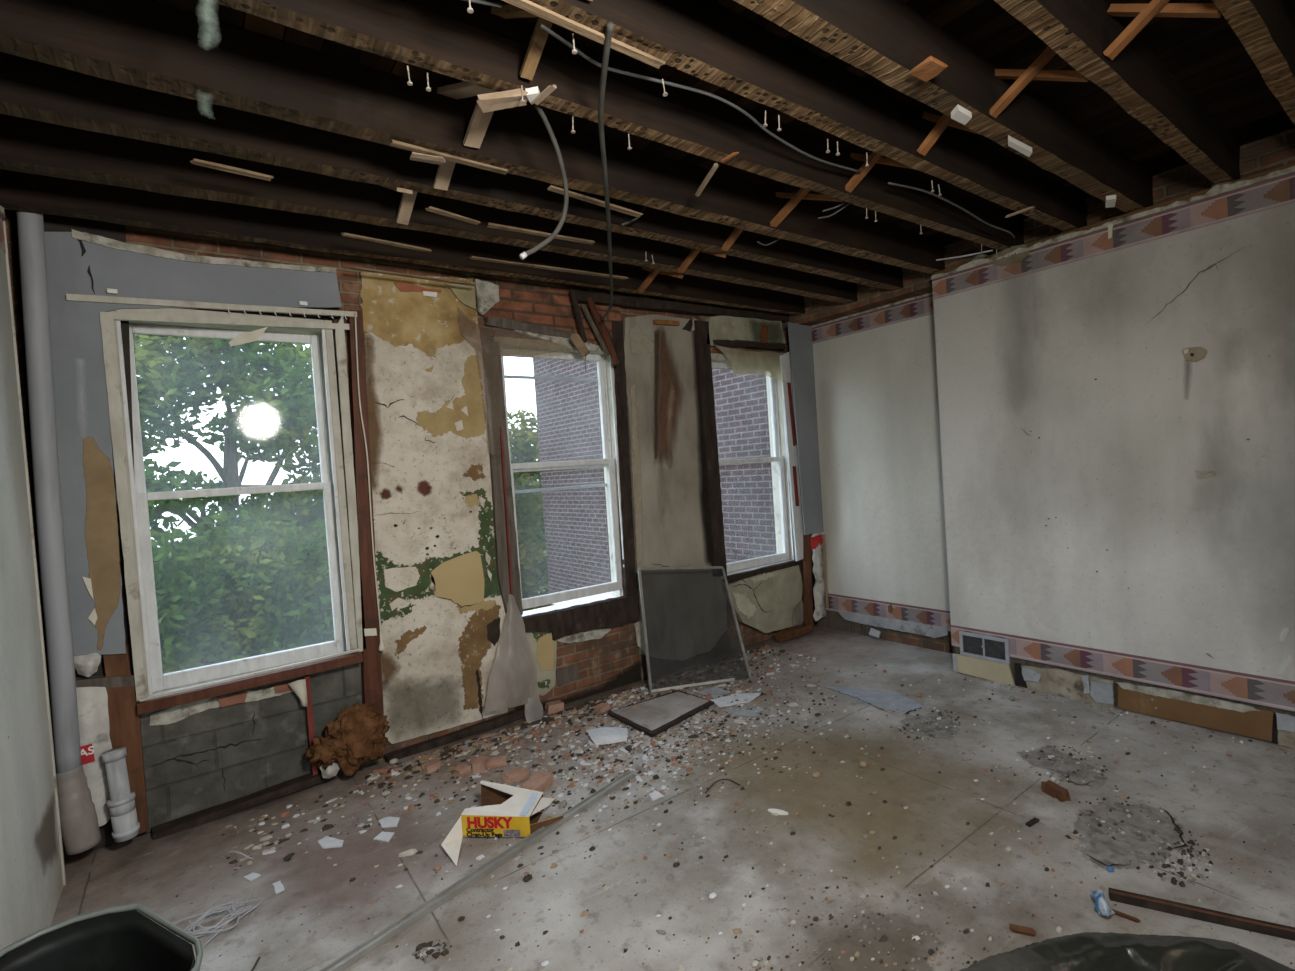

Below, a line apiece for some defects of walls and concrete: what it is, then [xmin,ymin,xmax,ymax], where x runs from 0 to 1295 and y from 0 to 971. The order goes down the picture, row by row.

spalling [43,214,126,243]
spalling [120,321,135,481]
peeling [360,271,488,439]
crack [1146,248,1242,324]
spalling [11,210,56,767]
peeling [75,437,134,678]
peeling [375,463,501,710]
flaking render [515,622,648,714]
spalling [1115,682,1260,712]
spalling [62,819,117,860]